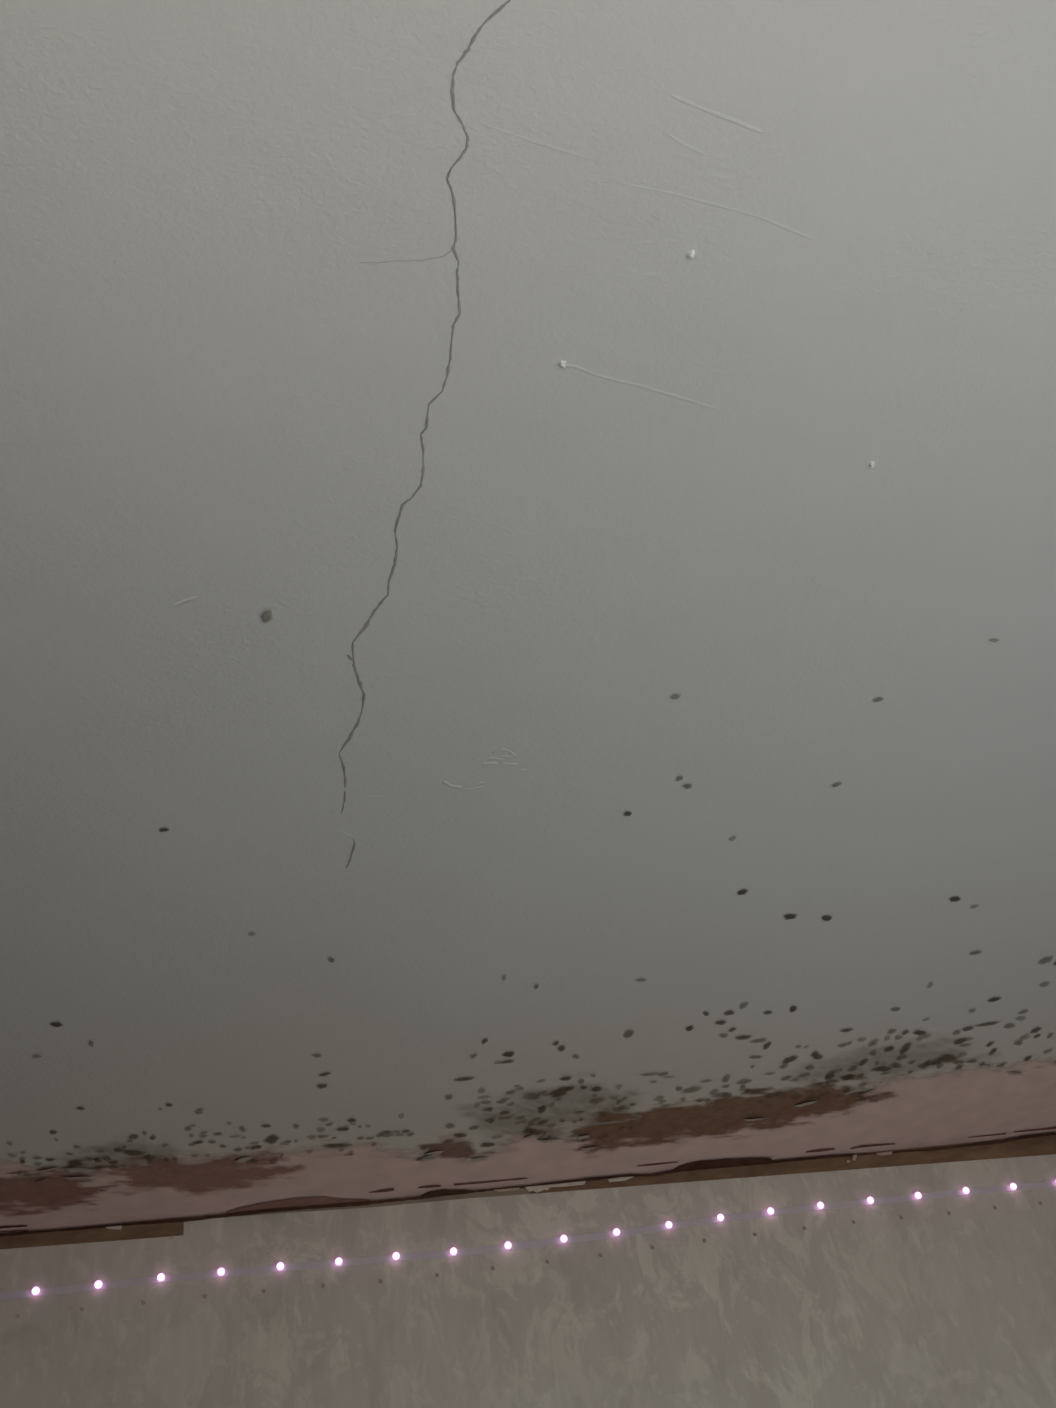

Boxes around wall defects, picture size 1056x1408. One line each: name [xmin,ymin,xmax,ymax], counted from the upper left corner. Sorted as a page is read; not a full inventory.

crack [339,0,511,868]
leakage [686,1011,772,1049]
leakage [932,1022,999,1065]
leakage [539,1077,601,1113]
leakage [573,1030,926,1151]
leakage [326,1119,356,1148]
leakage [421,1134,495,1158]
leakage [0,1125,301,1215]